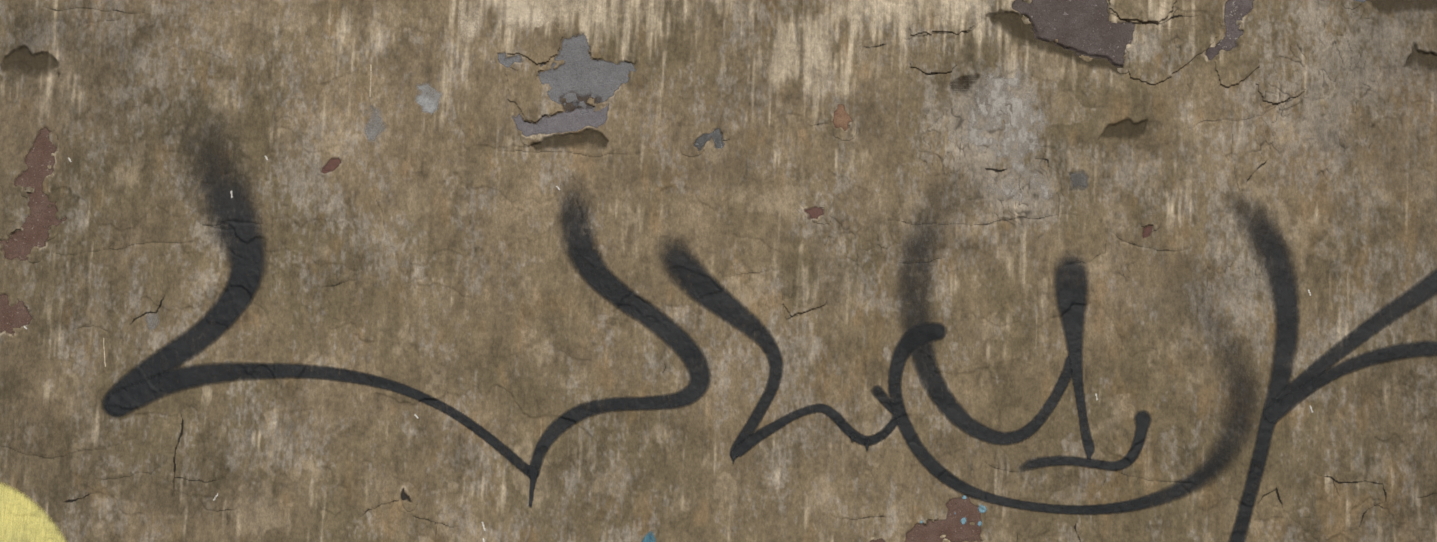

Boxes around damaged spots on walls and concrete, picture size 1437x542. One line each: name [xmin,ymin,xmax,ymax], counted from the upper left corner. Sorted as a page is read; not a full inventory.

peeling [459,6,481,39]
peeling [504,0,560,28]
peeling [990,0,1135,74]
peeling [1205,0,1254,60]
spalling [1341,0,1437,12]
spalling [1,47,59,75]
peeling [498,34,637,149]
peeling [0,127,67,264]
peeling [0,294,32,334]
peeling [905,495,990,542]